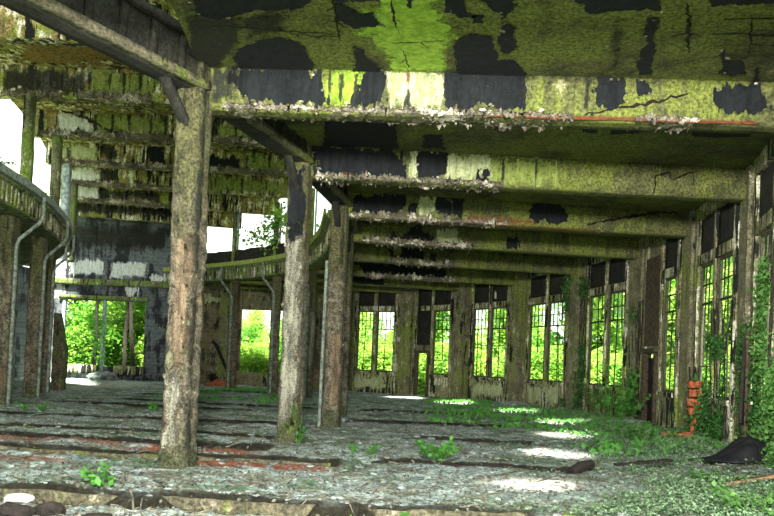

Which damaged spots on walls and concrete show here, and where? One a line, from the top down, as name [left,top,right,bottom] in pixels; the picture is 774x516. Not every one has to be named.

crack [388,0,441,71]
damp [3,66,112,96]
damp [328,71,358,106]
damp [387,71,444,110]
crack [584,93,688,116]
crack [653,171,697,192]
peeling [222,0,774,424]
crack [587,212,675,226]